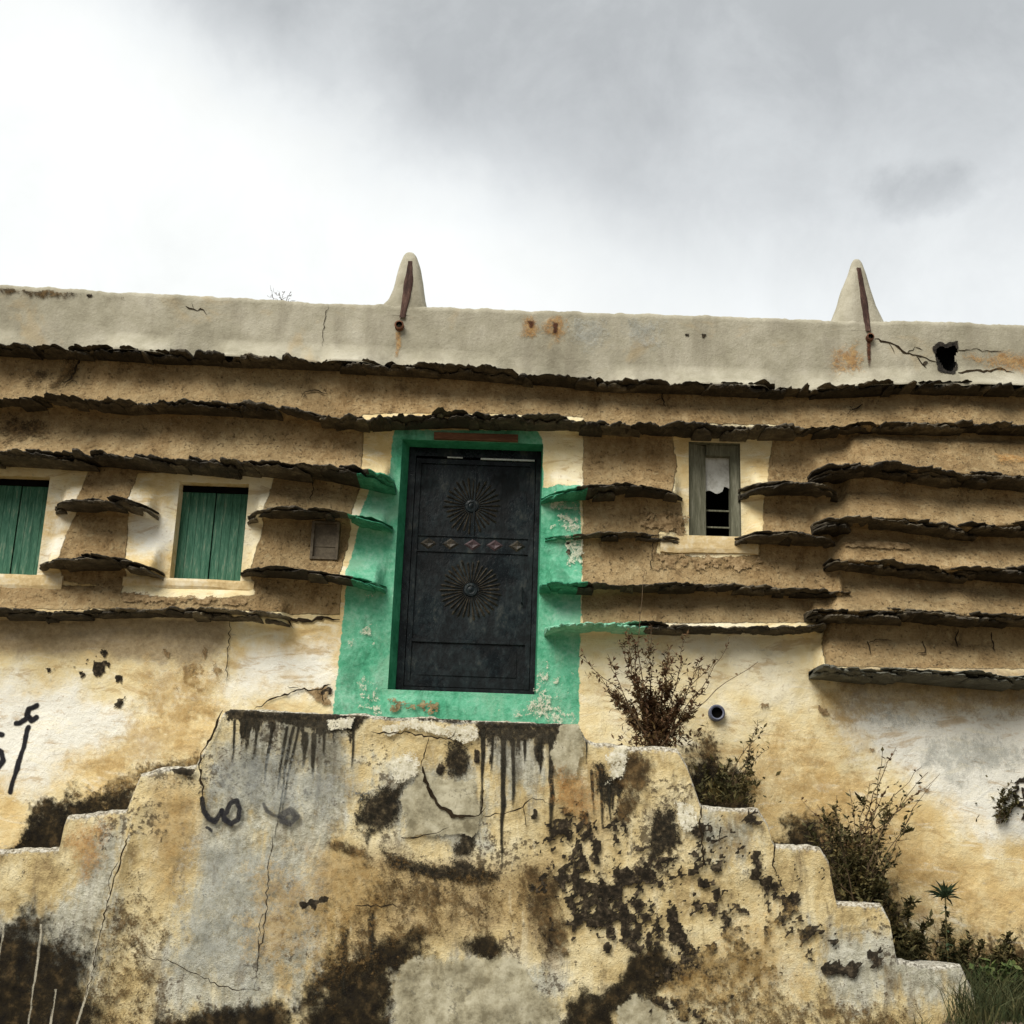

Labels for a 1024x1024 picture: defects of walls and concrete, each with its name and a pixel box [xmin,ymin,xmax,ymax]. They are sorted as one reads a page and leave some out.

corrosion [524,316,568,340]
spalling [923,341,959,374]
crack [874,338,1014,373]
flaking render [79,649,126,708]
crack [198,710,223,796]
crack [256,684,330,707]
crack [371,730,549,839]
flaking render [514,661,584,784]
leakage [581,731,655,831]
leakage [0,709,571,1024]
leakage [645,806,682,861]
leakage [559,945,923,1024]